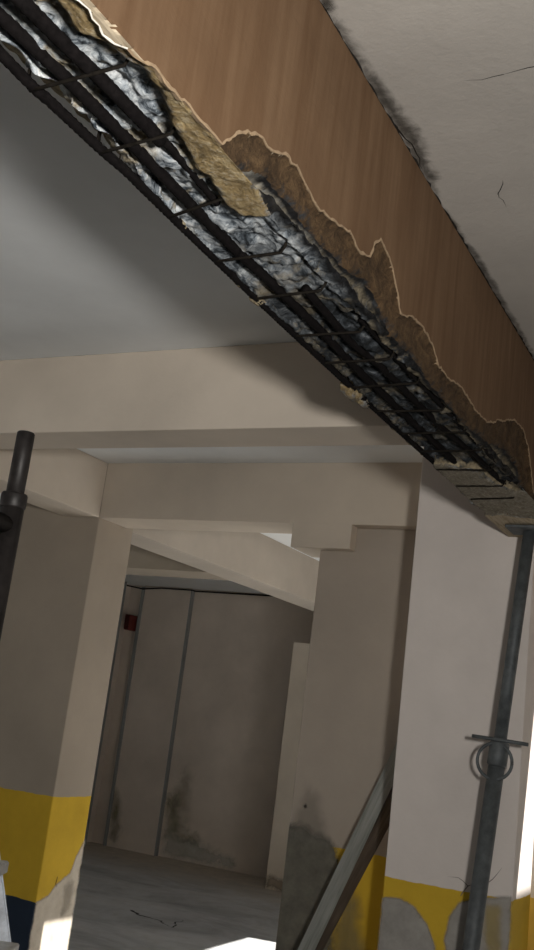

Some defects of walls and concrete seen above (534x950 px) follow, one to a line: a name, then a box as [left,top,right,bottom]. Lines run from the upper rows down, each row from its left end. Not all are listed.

crack [321,3,532,354]
spalling [0,0,534,519]
water stain [266,825,339,950]
peeling [378,897,469,950]
peeling [480,897,511,950]